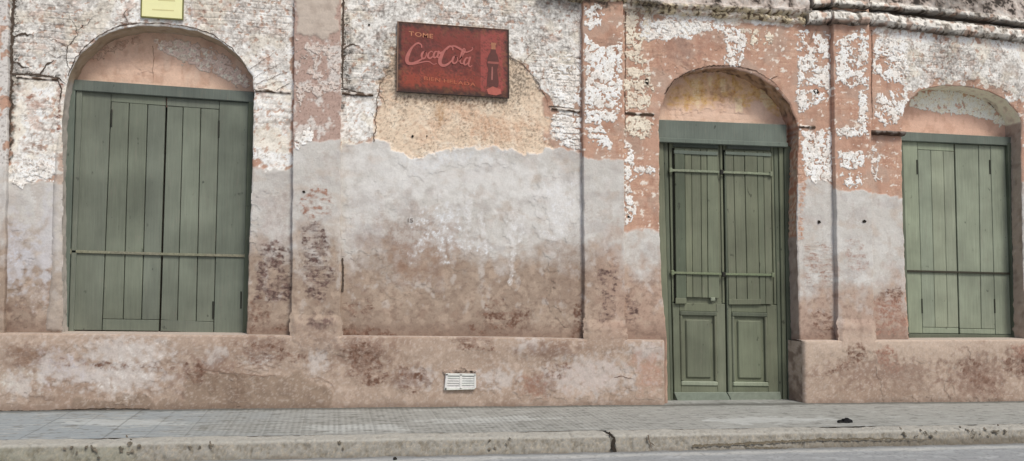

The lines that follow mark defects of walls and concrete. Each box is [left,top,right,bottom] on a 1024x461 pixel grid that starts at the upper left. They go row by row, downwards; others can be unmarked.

peeling [12,138,55,190]
flaking render [21,82,66,132]
peeling [92,9,252,88]
peeling [294,126,314,150]
peeling [295,38,340,112]
peeling [546,0,774,225]
peeling [795,28,1006,290]
crack [605,432,617,452]